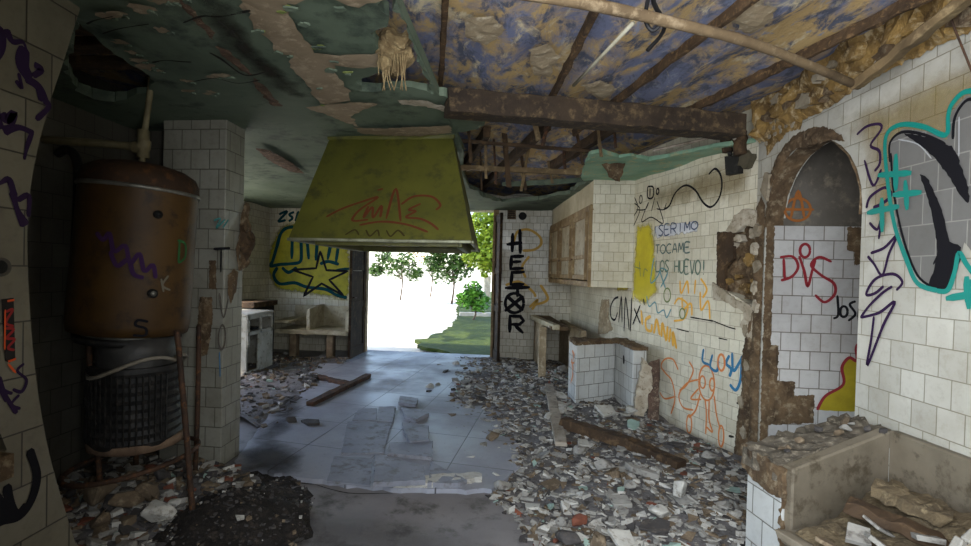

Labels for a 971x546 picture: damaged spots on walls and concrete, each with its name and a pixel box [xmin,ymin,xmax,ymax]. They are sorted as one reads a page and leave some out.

peeling [95,0,192,36]
peeling [239,0,452,137]
spalling [878,16,971,77]
spalling [712,0,951,546]